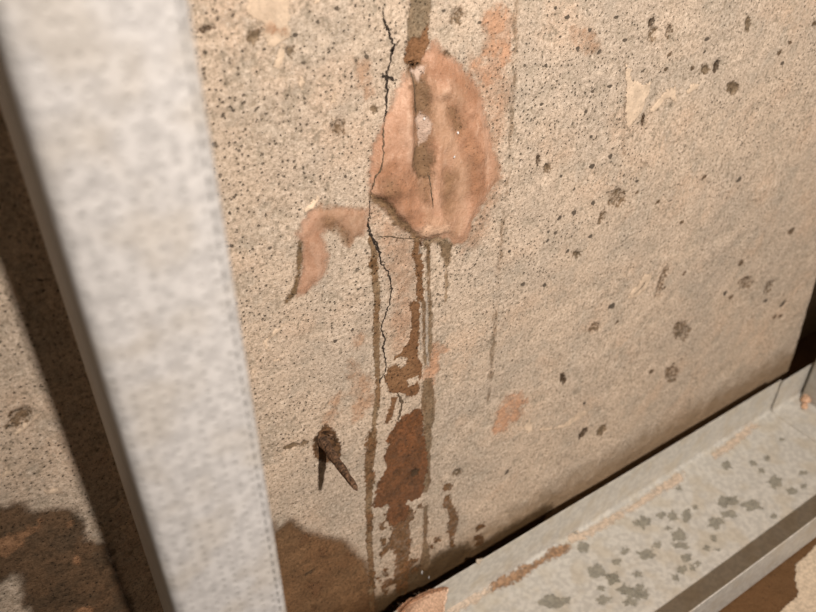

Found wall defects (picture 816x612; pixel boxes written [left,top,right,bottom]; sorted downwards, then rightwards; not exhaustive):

crack [367,8,417,421]
damp [273,0,551,612]
rust [313,424,341,463]
damp [0,503,133,612]
rust [371,408,428,596]
rust [430,483,460,549]
rust [473,521,486,546]